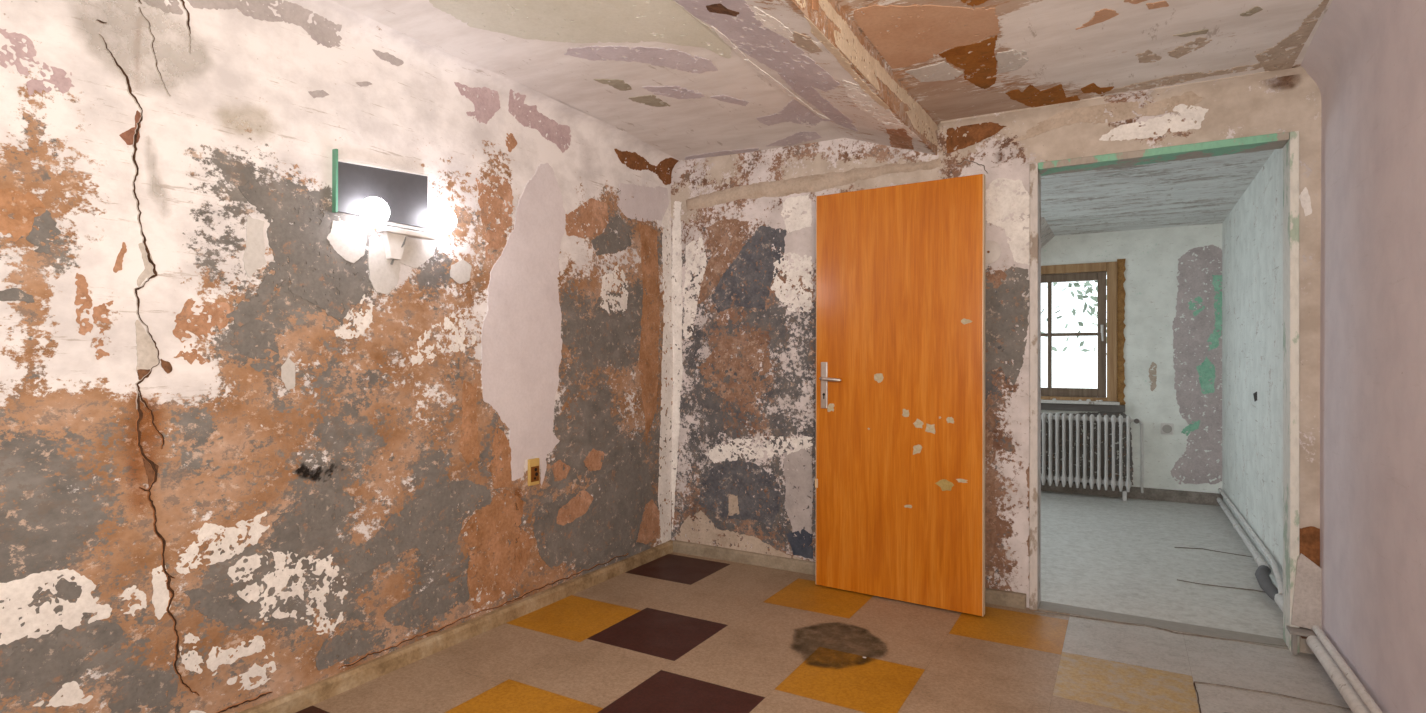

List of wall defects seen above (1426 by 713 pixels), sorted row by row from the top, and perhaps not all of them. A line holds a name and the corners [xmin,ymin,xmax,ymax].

peeling [372,49,404,66]
flaking render [119,110,141,145]
peeling [0,188,61,254]
peeling [0,288,35,303]
peeling [74,273,113,360]
peeling [113,242,127,273]
crack [96,0,273,713]
peeling [135,174,375,380]
peeling [410,314,477,366]
peeling [429,0,1329,588]
peeling [0,428,534,713]
water stain [793,623,884,668]